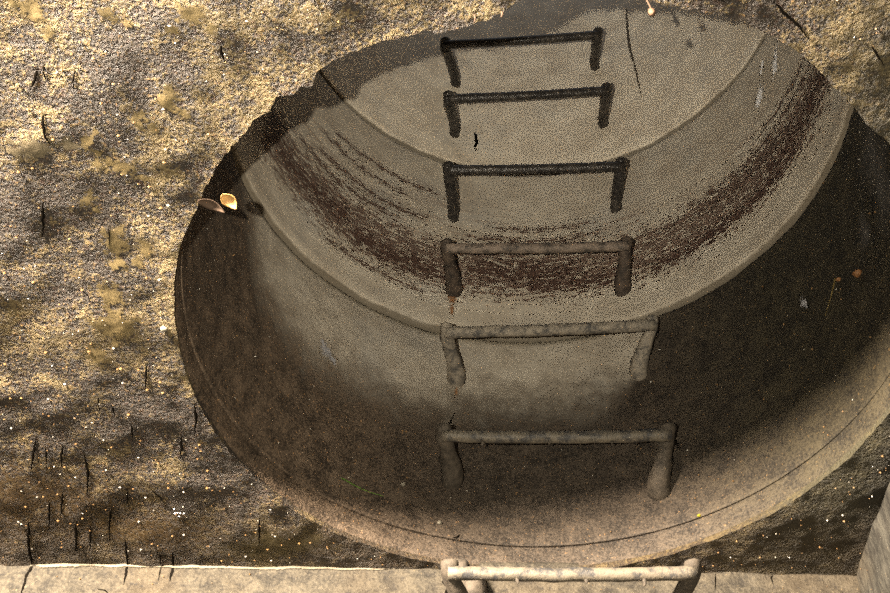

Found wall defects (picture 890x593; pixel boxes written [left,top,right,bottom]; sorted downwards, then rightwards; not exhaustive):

crack [625,9,642,97]
crack [39,202,47,237]
crack [30,436,64,476]
crack [82,455,90,496]
crack [21,489,129,593]